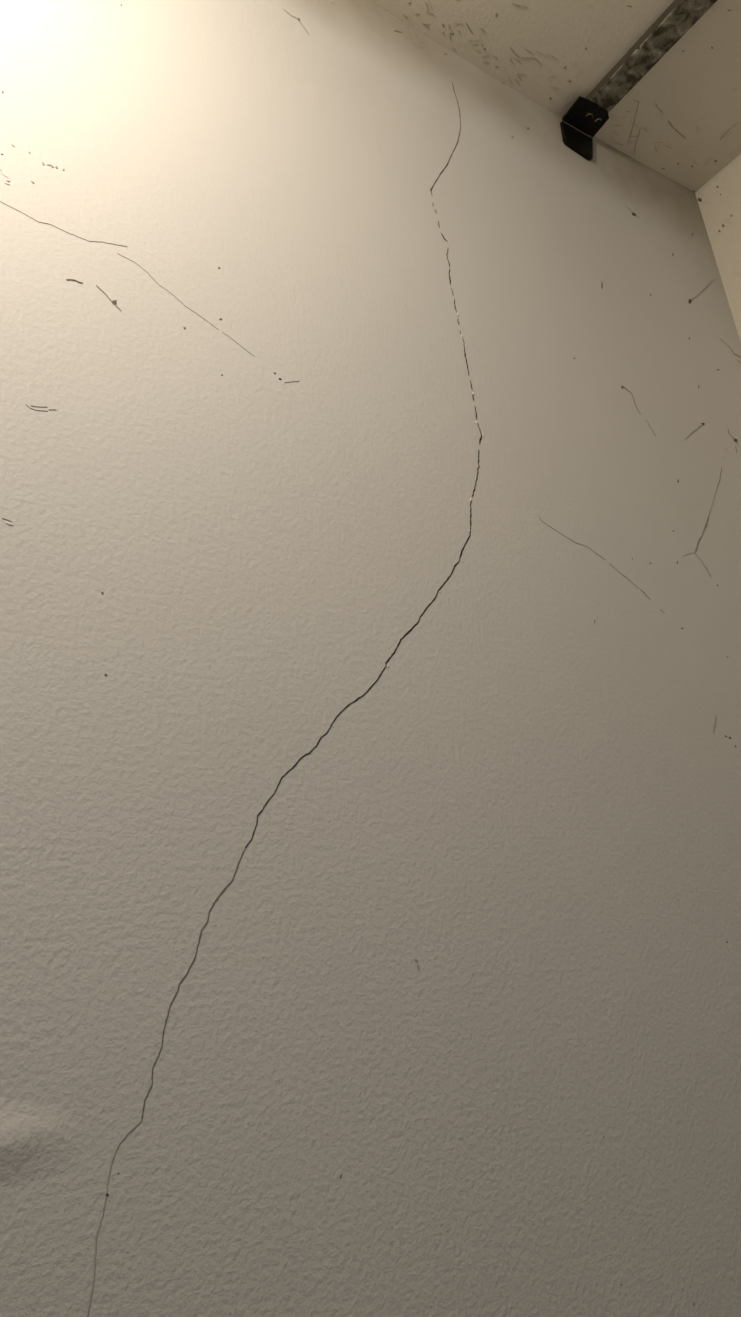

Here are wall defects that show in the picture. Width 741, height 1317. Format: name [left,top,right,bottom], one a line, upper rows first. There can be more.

crack [0,201,296,383]
crack [87,82,484,1317]